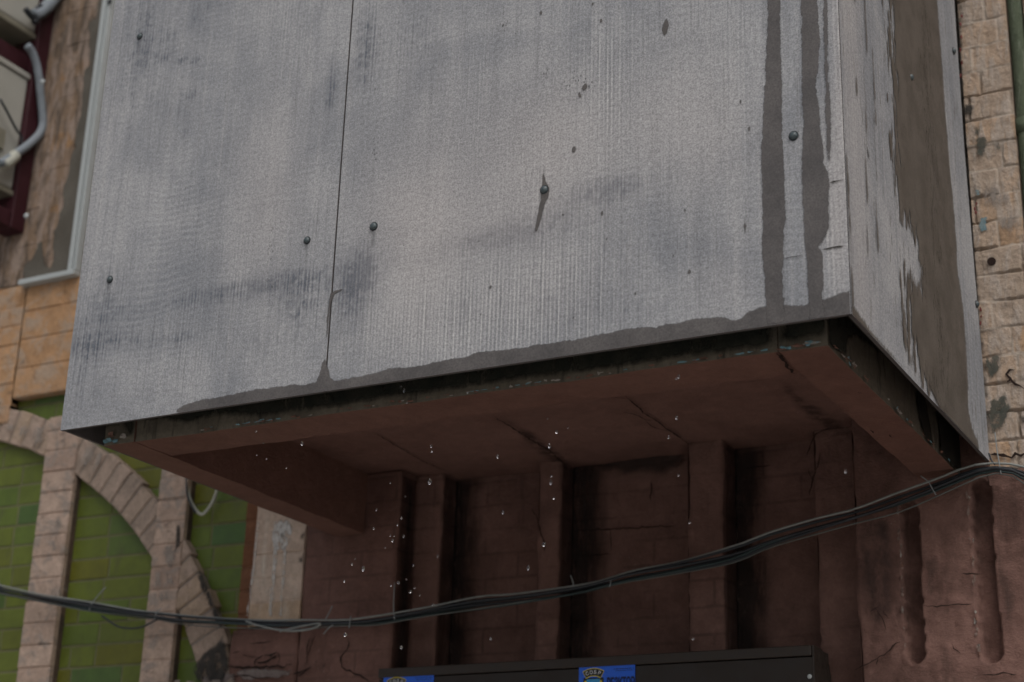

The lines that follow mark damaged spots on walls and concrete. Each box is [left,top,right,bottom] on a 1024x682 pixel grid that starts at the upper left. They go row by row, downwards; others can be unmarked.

water stain [975,127,1000,156]
water stain [152,0,979,473]
crack [776,353,795,374]
water stain [986,355,1002,377]
water stain [988,395,1010,433]